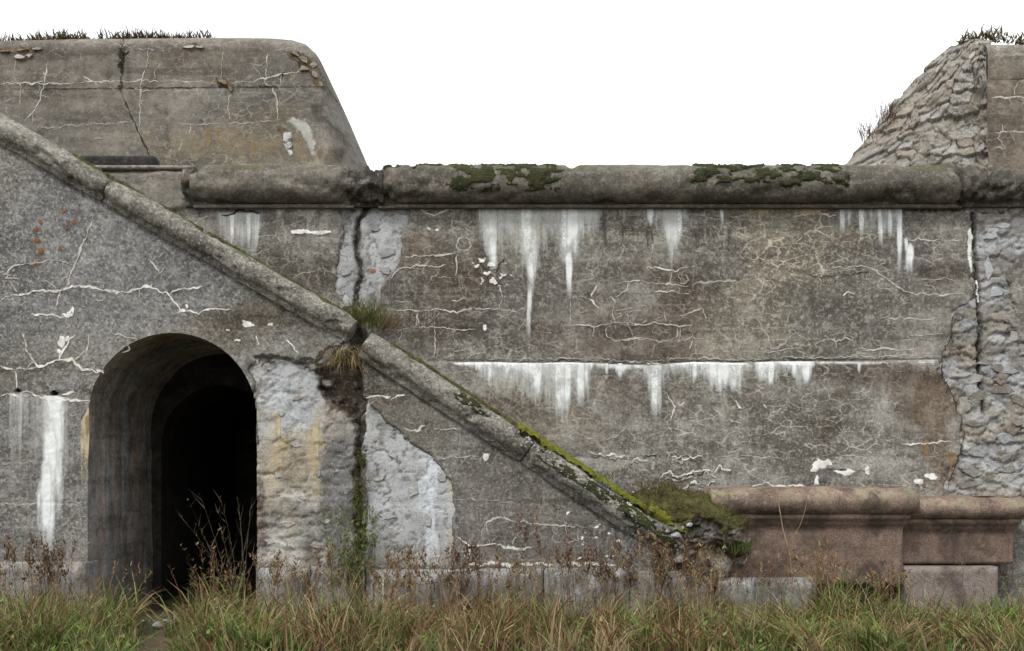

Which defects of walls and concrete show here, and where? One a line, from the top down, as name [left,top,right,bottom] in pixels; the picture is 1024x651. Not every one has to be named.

crack [6,47,311,156]
efflorescence [37,396,64,541]
efflorescence [218,213,260,242]
crack [1,208,478,551]
spalling [249,341,455,567]
flaking render [335,165,410,316]
damp [471,209,709,326]
crack [570,266,751,359]
efflorescence [455,354,941,411]
crack [759,214,980,493]
damp [840,208,966,268]
spalling [936,164,1024,500]